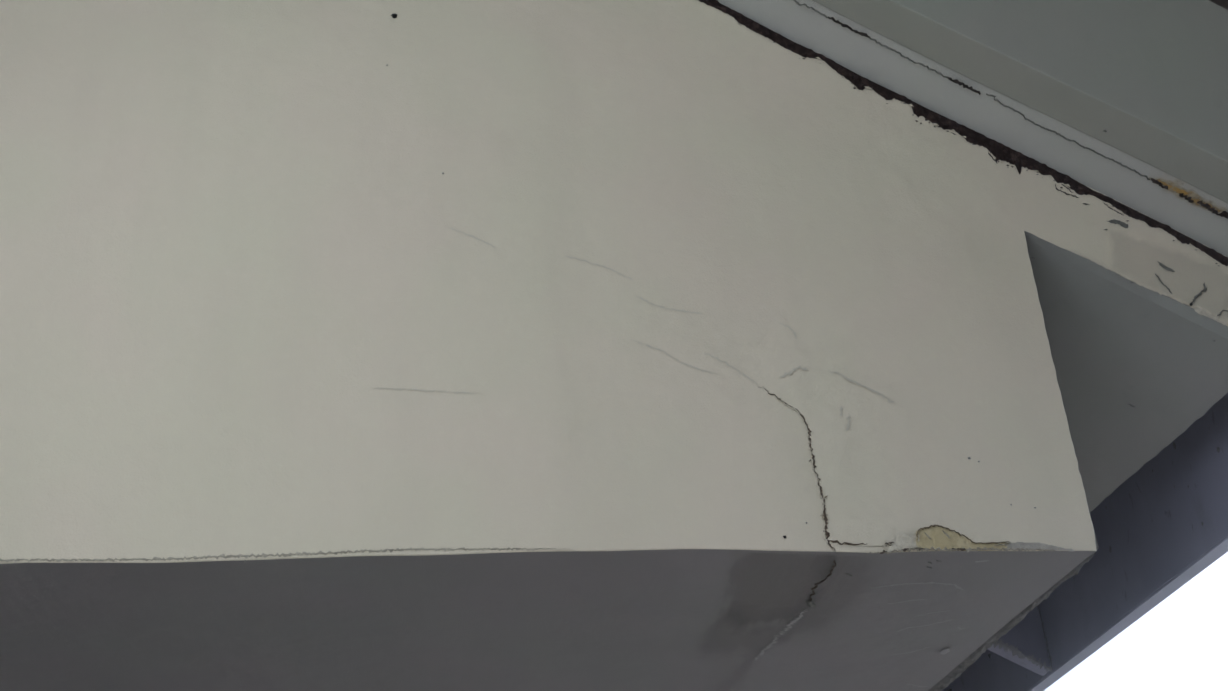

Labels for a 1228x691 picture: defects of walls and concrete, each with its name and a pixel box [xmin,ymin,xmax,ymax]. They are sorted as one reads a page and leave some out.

crack [794,0,1228,219]
peeling [1104,202,1128,229]
crack [633,322,894,691]
spalling [869,525,1074,554]